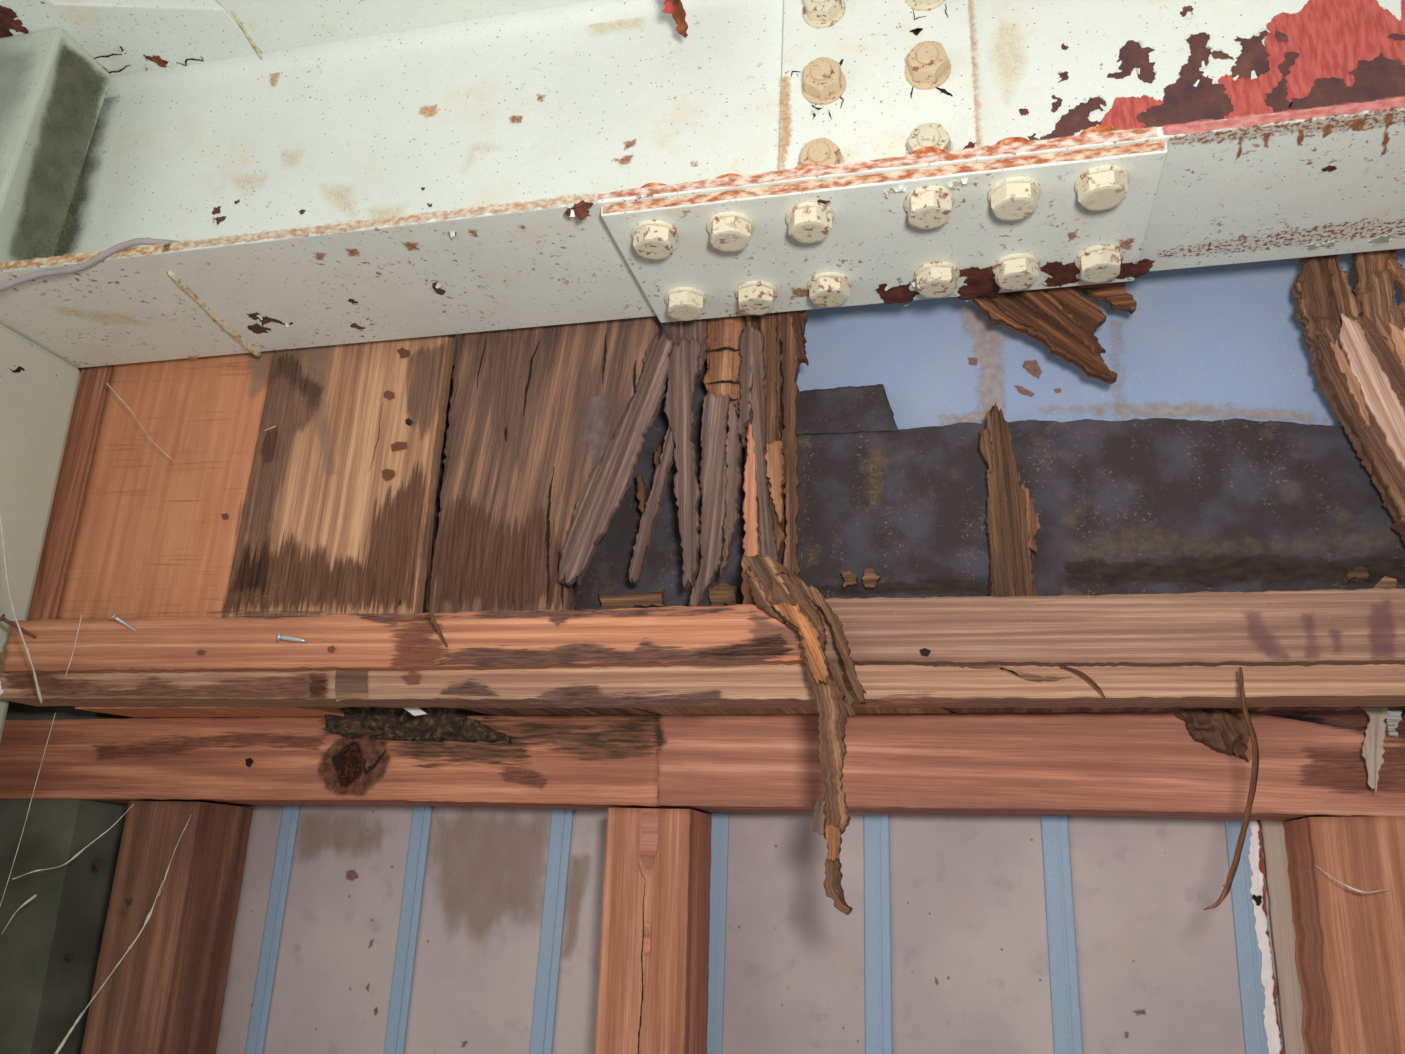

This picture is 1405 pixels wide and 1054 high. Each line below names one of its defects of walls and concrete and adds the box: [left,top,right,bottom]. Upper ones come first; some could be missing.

peeling [1028,0,1405,141]
rust [0,0,1405,280]
rust [875,281,919,306]
rust [957,266,1001,302]
rust [1040,261,1080,287]
leakage [208,332,802,700]
leakage [92,685,721,788]
leakage [441,817,540,931]
leakage [567,859,587,950]
crack [638,863,647,1054]